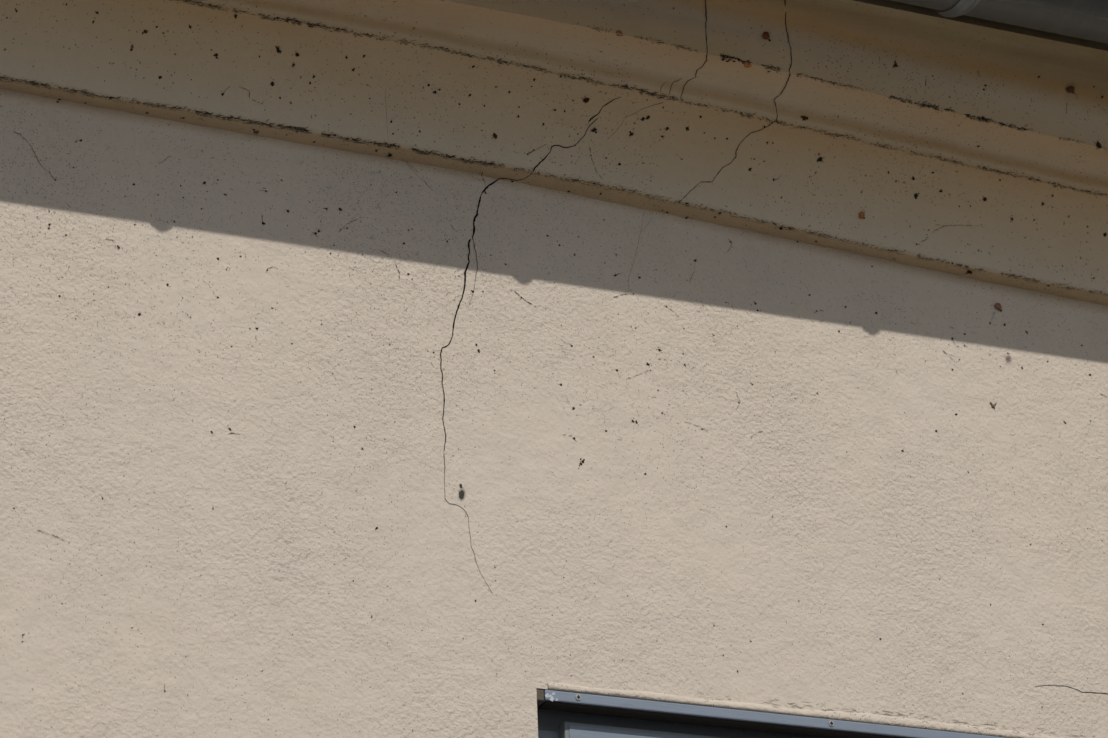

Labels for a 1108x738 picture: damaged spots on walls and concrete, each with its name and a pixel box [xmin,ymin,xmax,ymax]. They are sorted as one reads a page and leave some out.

crack [681,0,792,201]
crack [440,0,708,591]
crack [760,699,1095,737]